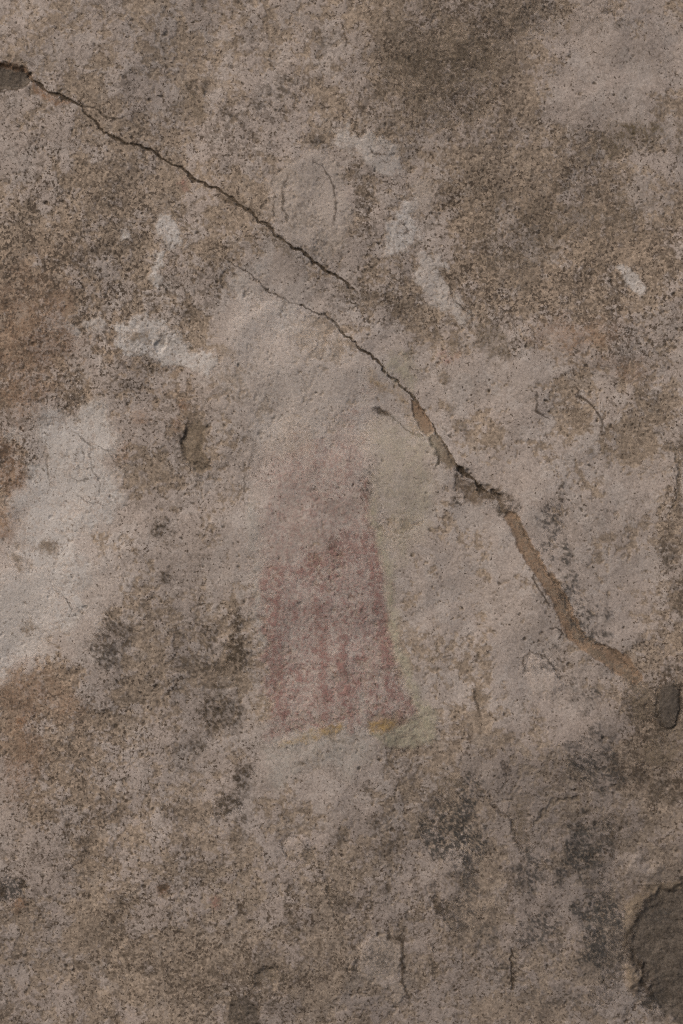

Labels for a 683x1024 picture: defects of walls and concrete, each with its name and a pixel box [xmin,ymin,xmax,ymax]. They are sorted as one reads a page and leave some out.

crack [31,72,363,297]
leakage [595,121,683,161]
crack [239,267,643,685]